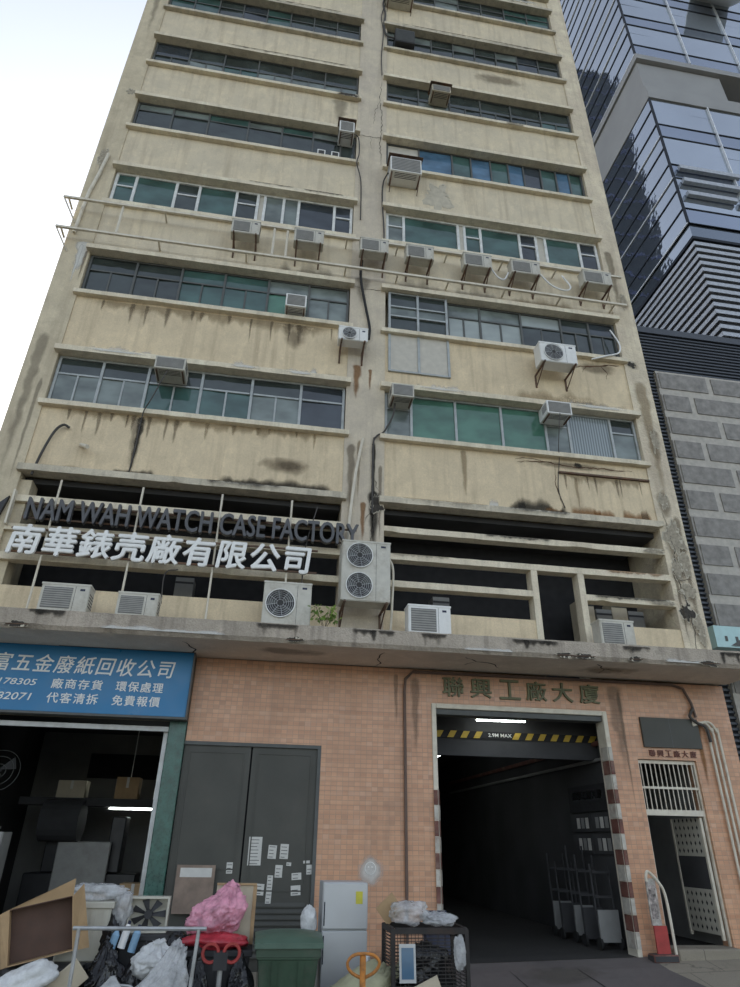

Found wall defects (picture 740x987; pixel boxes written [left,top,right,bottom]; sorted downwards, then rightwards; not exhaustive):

corrosion [354,365,372,392]
water stain [511,501,570,514]
corrosion [573,510,651,520]
spalling [644,493,692,581]
spalling [651,600,697,623]